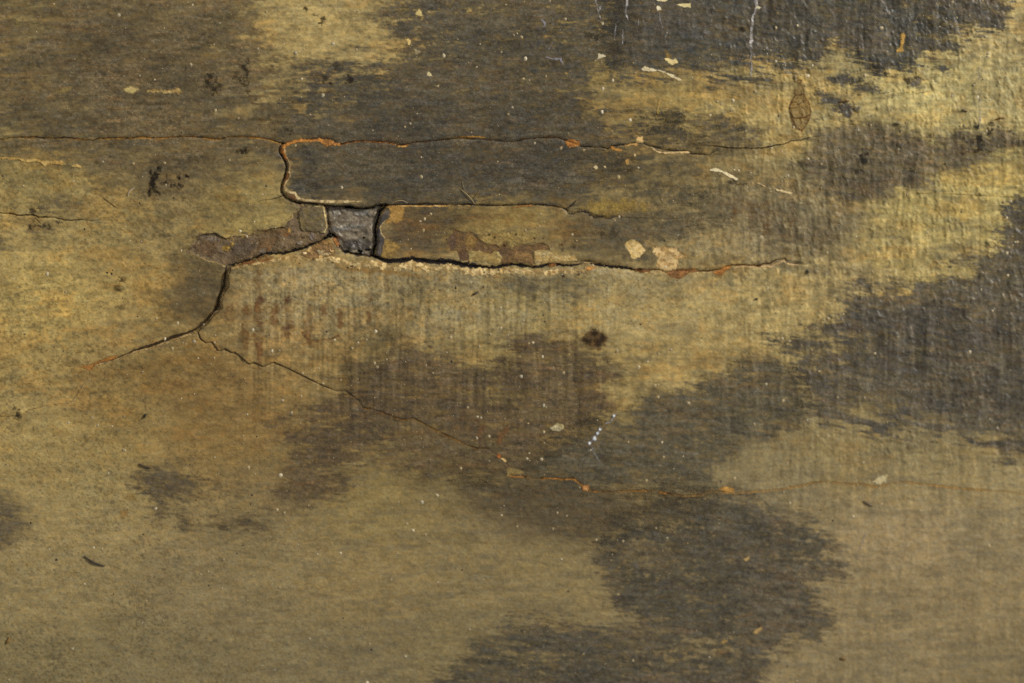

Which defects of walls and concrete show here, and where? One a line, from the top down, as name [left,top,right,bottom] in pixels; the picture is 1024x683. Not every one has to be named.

spalling [186,201,405,269]
crack [0,135,807,404]
water stain [0,0,1024,264]
water stain [126,464,209,518]
water stain [263,190,1024,683]
crack [364,407,988,497]